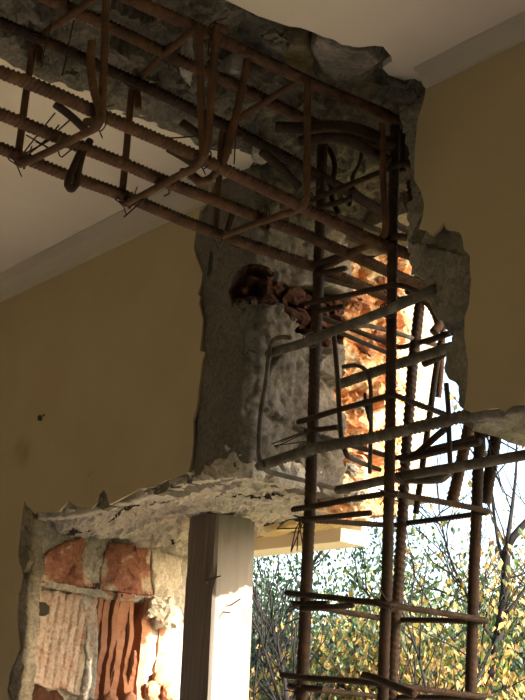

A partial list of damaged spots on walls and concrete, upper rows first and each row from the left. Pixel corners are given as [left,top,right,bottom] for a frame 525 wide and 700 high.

spalling [0,0,390,168]
spalling [151,0,525,504]
flaking render [8,451,305,700]